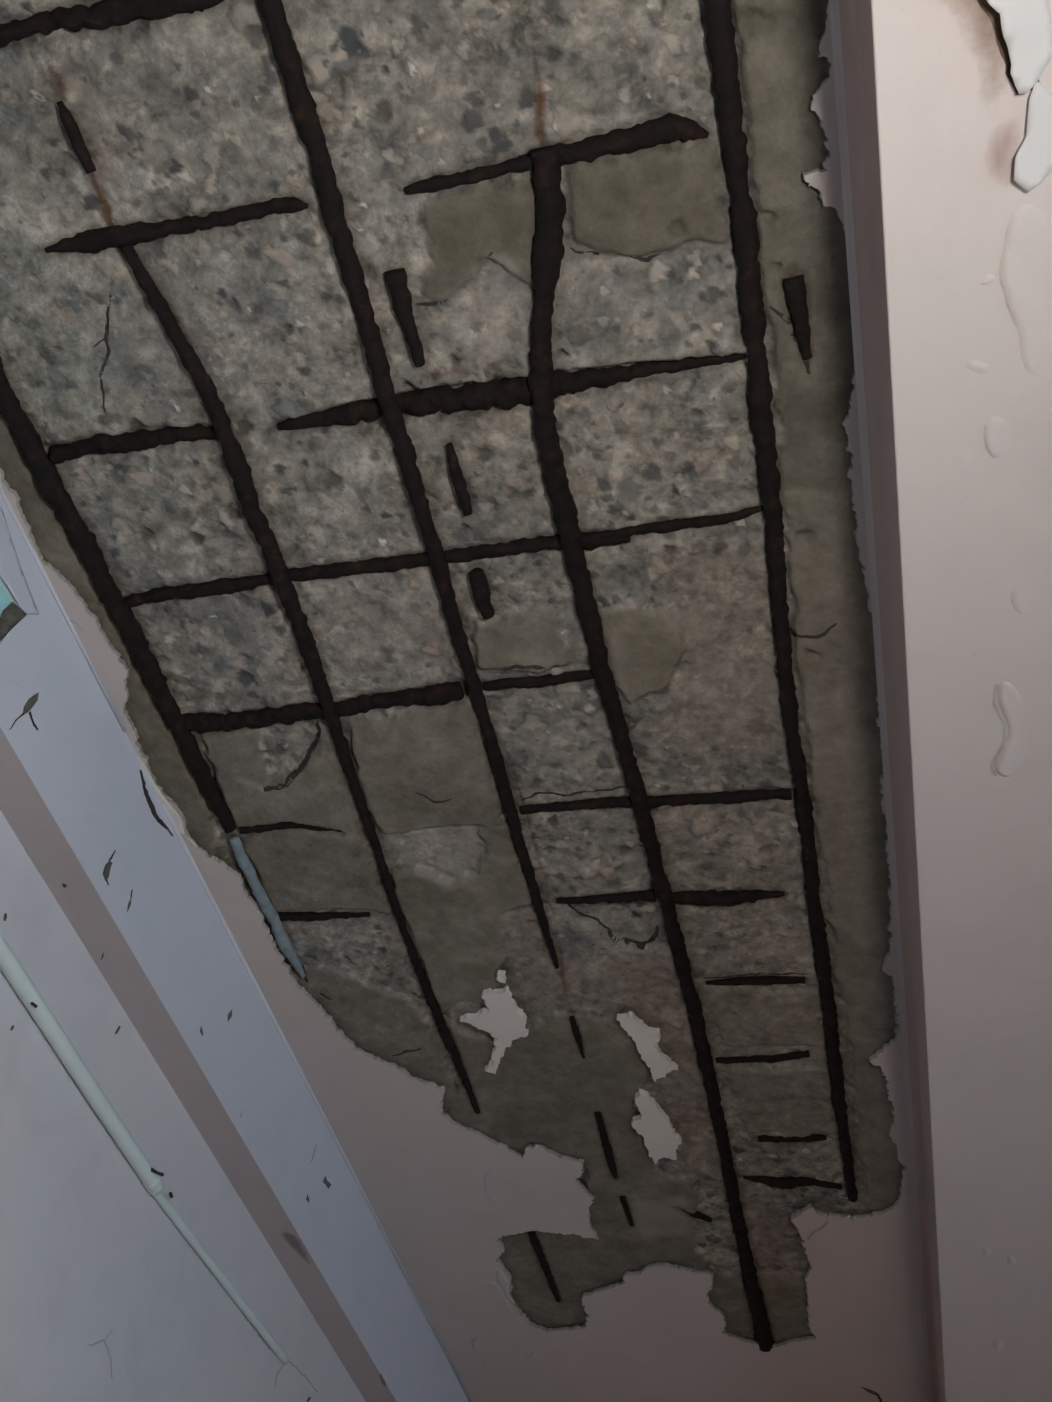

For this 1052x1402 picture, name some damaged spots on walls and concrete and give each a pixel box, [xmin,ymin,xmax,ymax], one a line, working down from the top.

corrosion [91,173,114,225]
spalling [0,0,427,715]
spalling [0,404,758,1345]
corrosion [536,85,544,137]
spalling [282,0,906,1349]
peeling [977,0,1052,192]